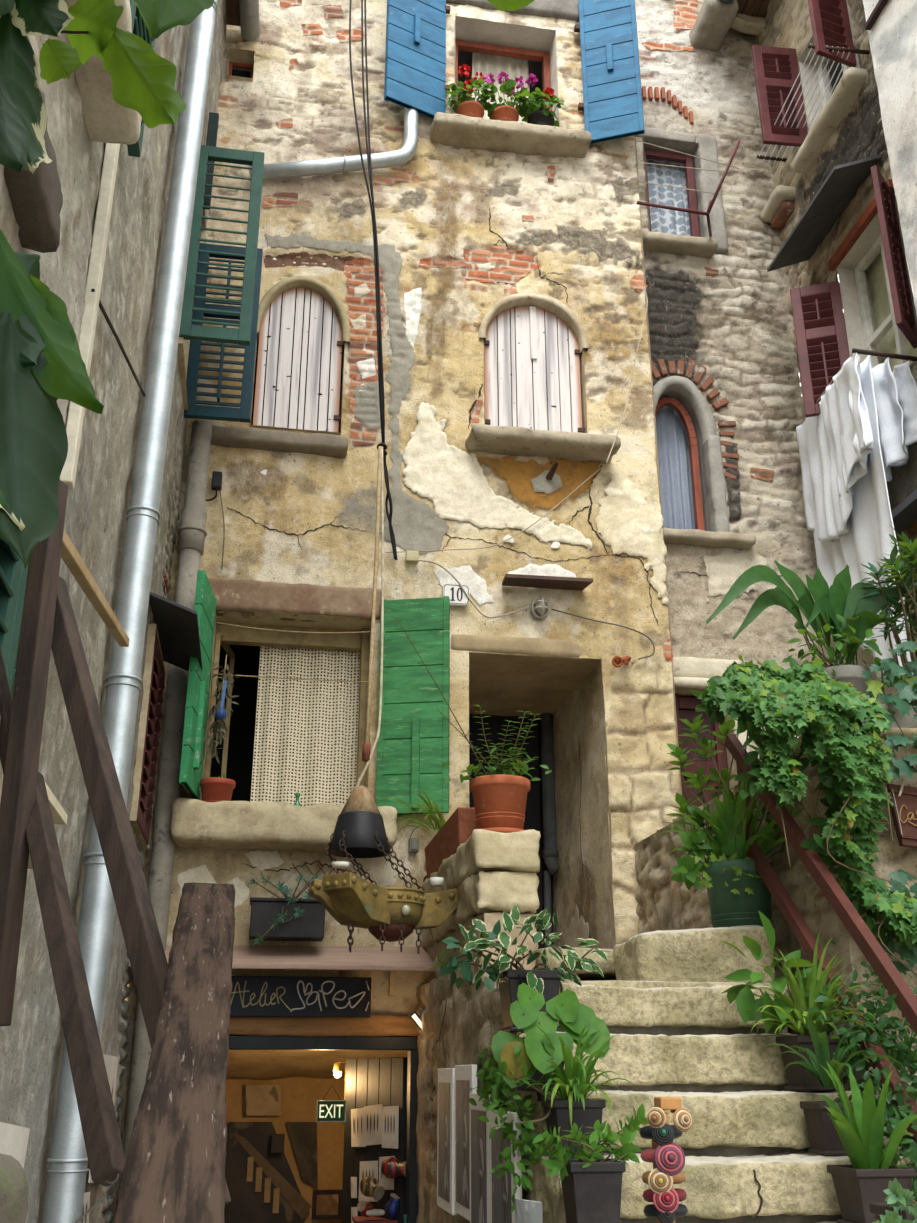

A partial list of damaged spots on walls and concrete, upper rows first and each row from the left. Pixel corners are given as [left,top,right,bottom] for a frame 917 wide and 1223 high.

spalling [419,215,648,296]
spalling [264,252,384,448]
flaking render [403,402,592,551]
crack [227,507,367,549]
flaking render [508,564,577,578]
crack [443,465,707,626]
crack [752,1169,763,1220]